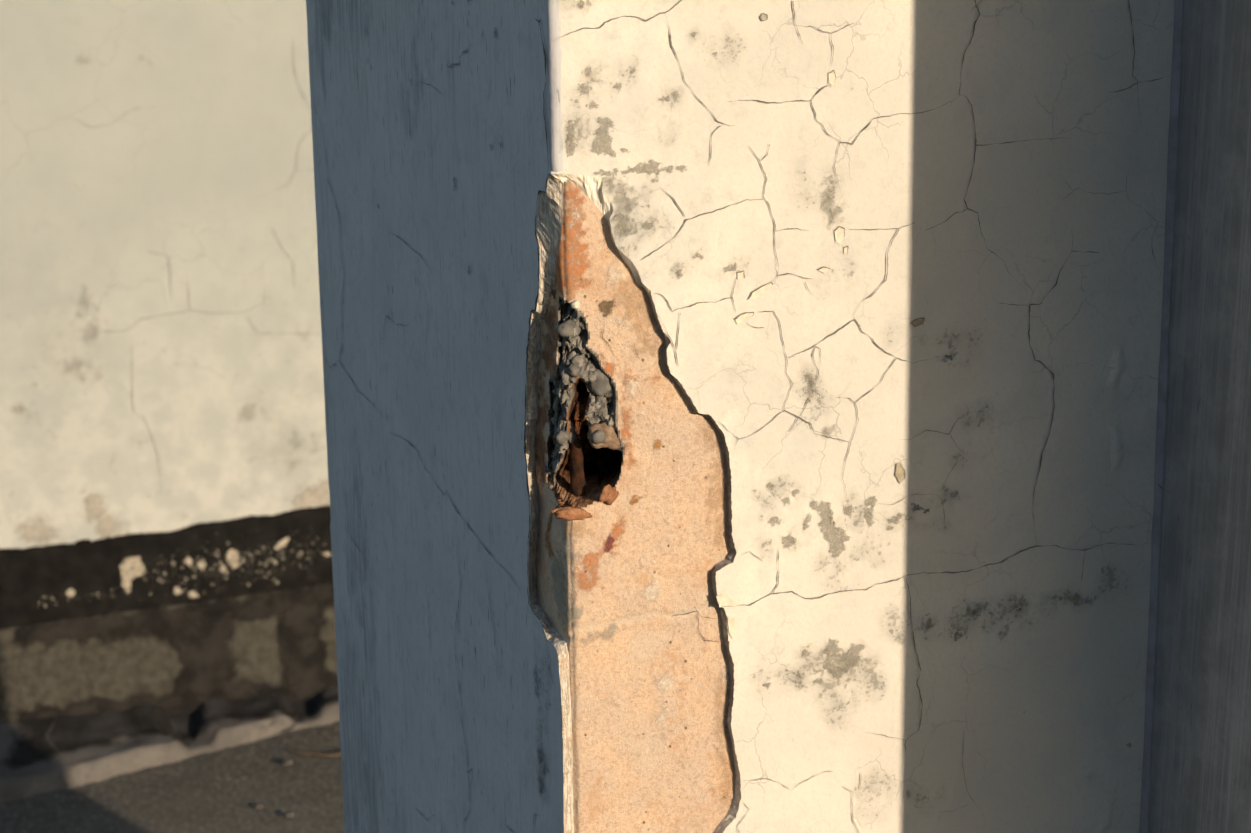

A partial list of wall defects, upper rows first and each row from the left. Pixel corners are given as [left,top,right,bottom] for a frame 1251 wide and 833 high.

mould [566,120,577,155]
mould [580,68,685,235]
crack [535,0,1134,751]
peeling [293,482,330,508]
spalling [524,171,741,833]
mould [771,496,877,557]
peeling [37,527,330,608]
mould [802,639,864,684]
crack [737,771,861,832]